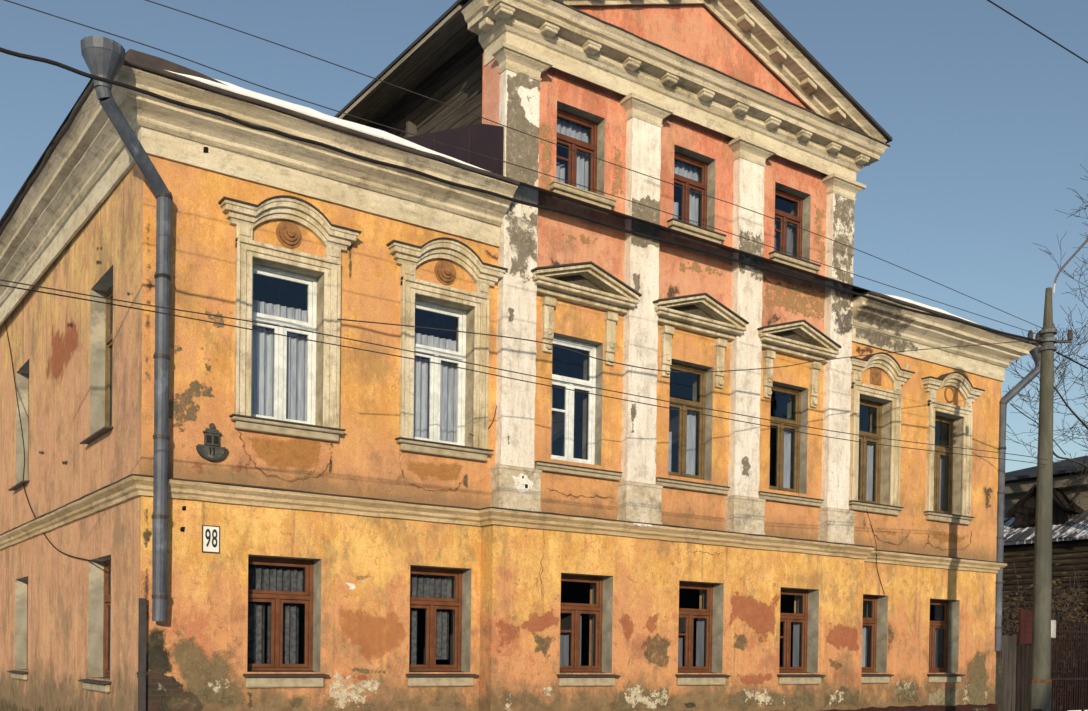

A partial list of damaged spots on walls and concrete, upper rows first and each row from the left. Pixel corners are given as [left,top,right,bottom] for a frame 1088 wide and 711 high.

peeling [505,72,556,283]
peeling [739,193,918,370]
flaking render [169,347,218,432]
crack [238,431,332,482]
crack [397,453,463,491]
crack [547,488,612,499]
peeling [498,609,559,652]
peeling [729,592,779,642]
spalling [136,670,203,711]
peeling [323,667,386,711]
peeling [624,684,669,711]
peeling [737,673,785,707]